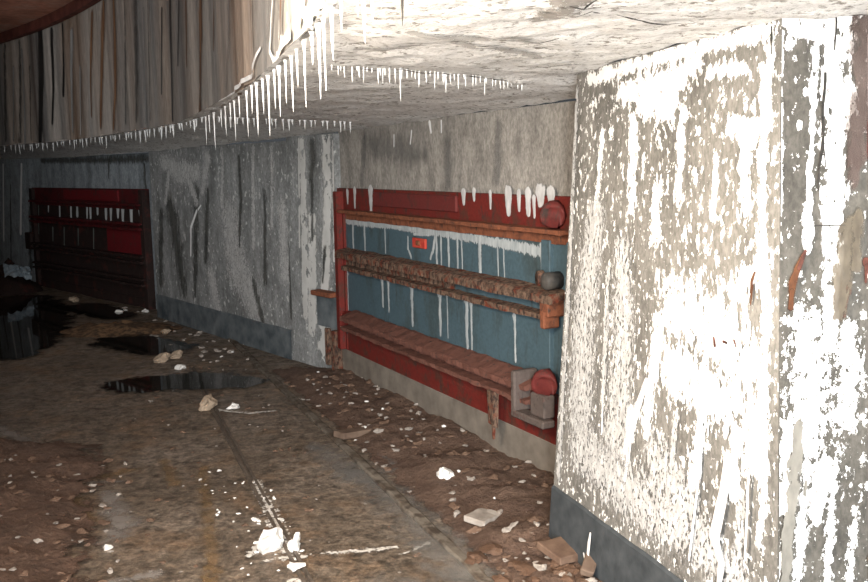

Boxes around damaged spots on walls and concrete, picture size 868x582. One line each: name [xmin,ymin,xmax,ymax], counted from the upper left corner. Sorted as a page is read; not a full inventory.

damp [41,134,335,357]
peeling [522,0,608,22]
peeling [587,18,830,276]
rust [788,249,807,311]
rust [844,15,868,189]
peeling [779,288,868,582]